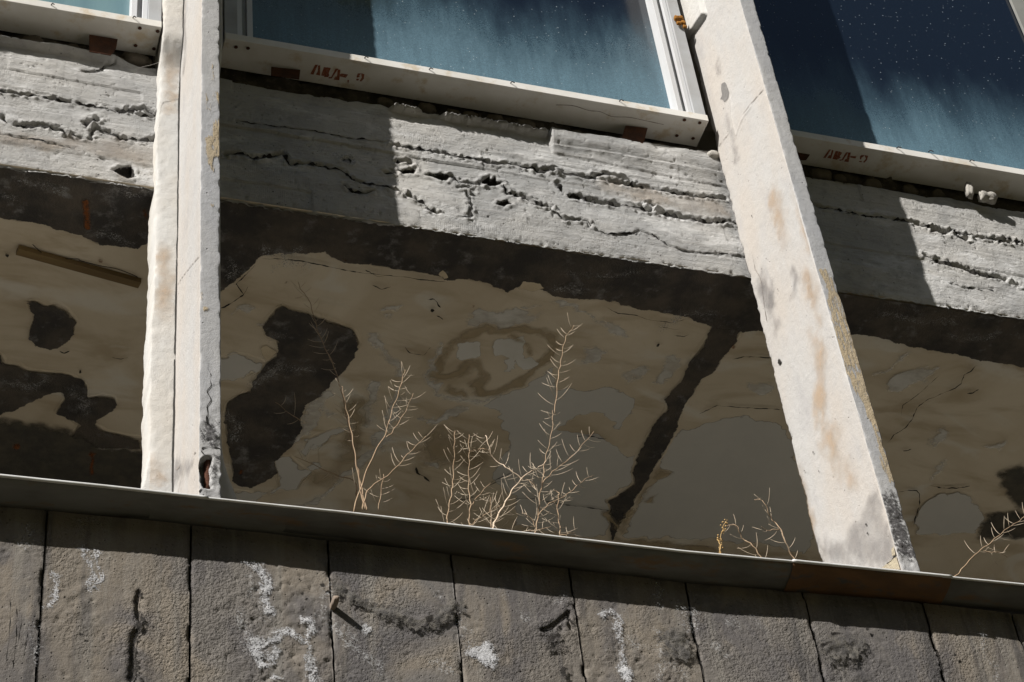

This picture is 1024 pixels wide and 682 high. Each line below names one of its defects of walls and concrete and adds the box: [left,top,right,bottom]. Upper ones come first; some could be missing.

peeling [205,120,219,172]
crack [0,0,221,492]
crack [227,120,767,321]
crack [820,207,1024,244]
crack [925,256,1018,289]
flaking render [24,298,79,350]
flaking render [0,351,142,450]
flaking render [211,200,763,541]
leakage [418,307,679,537]
leakage [80,546,105,592]
leakage [243,561,320,682]
leakage [464,641,499,669]